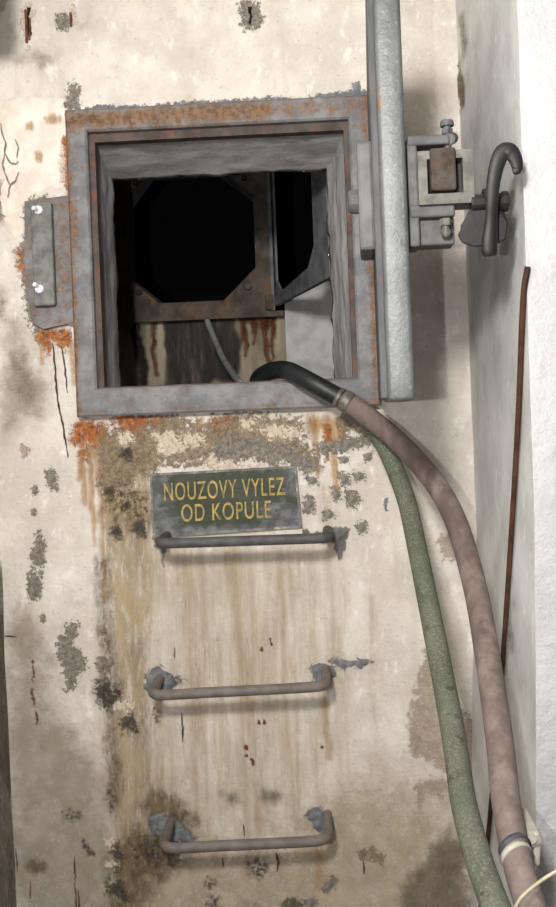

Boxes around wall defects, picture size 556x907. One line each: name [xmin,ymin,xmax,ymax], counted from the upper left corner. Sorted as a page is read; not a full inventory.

hole [236,0,266,33]
crack [0,123,19,218]
corrosion [35,328,75,383]
crack [52,343,69,457]
corrosion [68,415,176,528]
corrosion [309,417,343,491]
peeling [26,529,48,604]
peeling [55,619,90,694]
leakage [0,442,472,907]